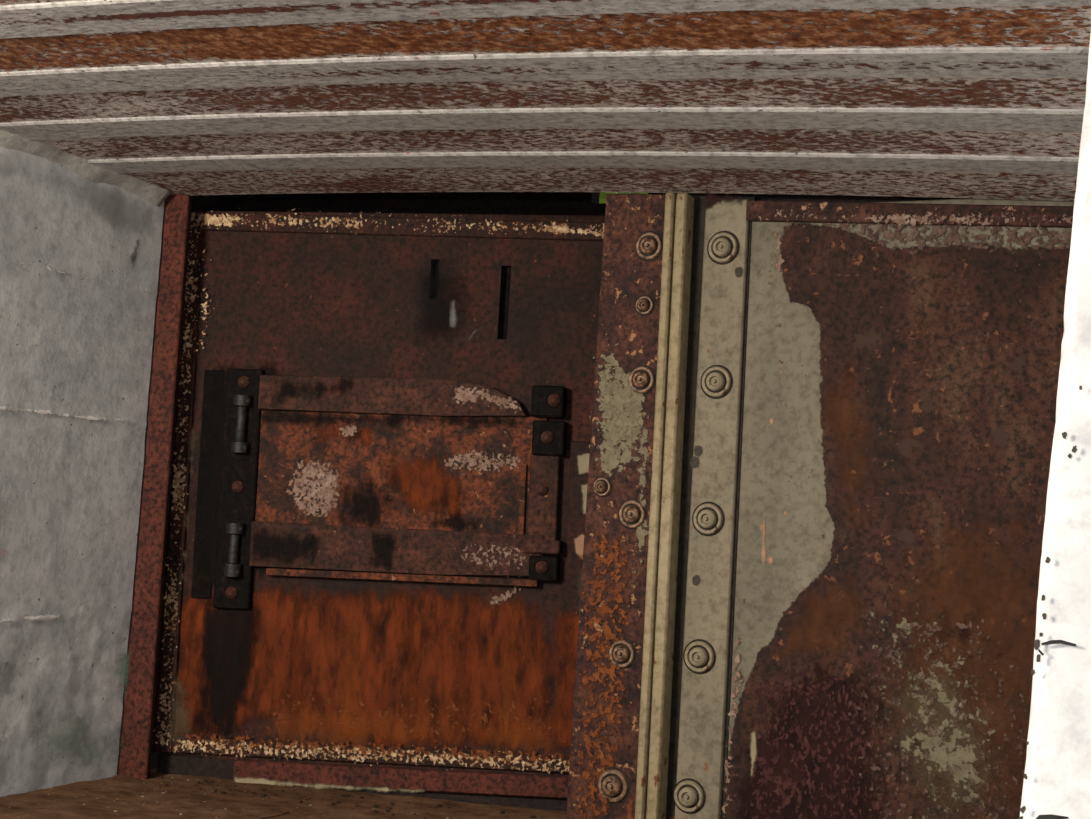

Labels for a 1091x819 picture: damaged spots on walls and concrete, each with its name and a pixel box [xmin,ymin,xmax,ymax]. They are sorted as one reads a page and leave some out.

rust [0,0,1091,122]
rust [53,129,1079,159]
rust [132,167,1076,209]
rust [768,232,788,272]
peeling [578,343,654,514]
peeling [721,208,1077,819]
rust [175,534,637,819]
rust [732,650,901,819]